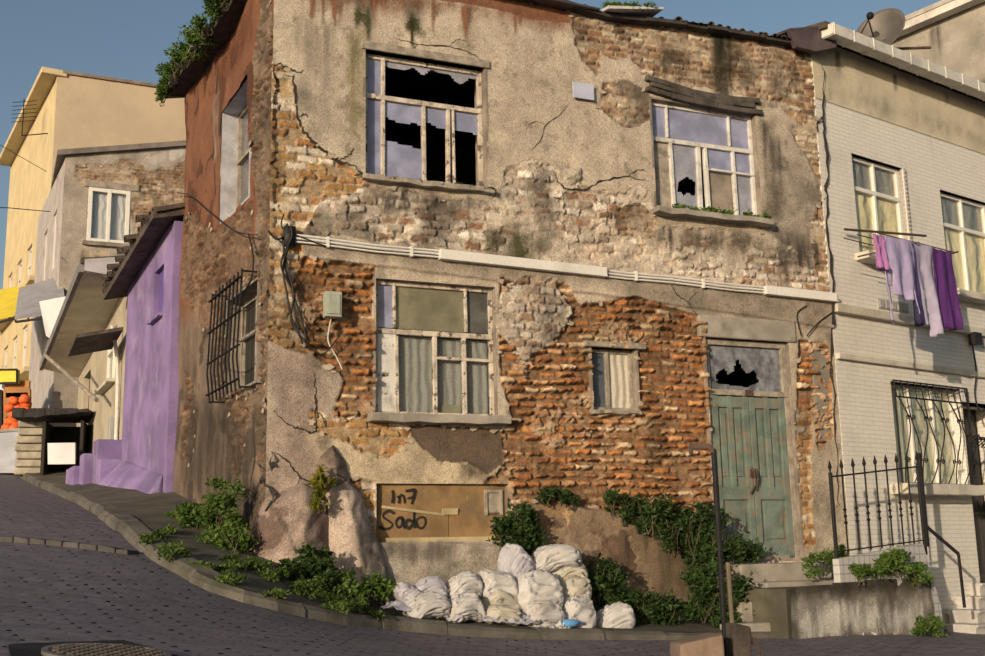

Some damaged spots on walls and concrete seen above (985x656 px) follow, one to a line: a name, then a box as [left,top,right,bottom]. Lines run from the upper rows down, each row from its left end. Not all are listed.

corrosion [310,0,451,26]
water stain [405,14,423,44]
corrosion [462,4,477,35]
crack [272,62,373,185]
crack [554,169,647,199]
flaking render [73,0,830,535]
crack [275,373,325,434]
flaking render [793,339,834,553]
crack [250,430,311,524]